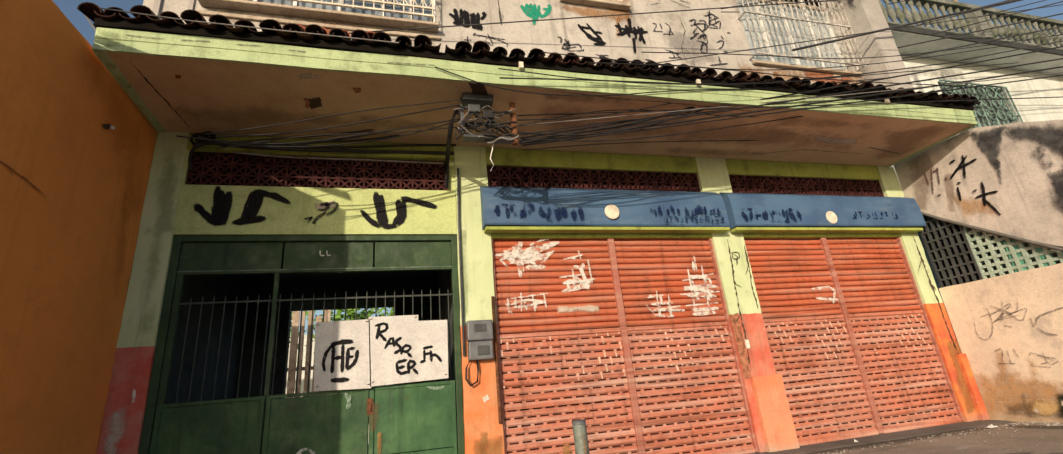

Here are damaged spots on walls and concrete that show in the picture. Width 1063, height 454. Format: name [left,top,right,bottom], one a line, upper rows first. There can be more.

crack [130,62,190,128]
crack [0,161,46,197]
damp [971,127,1063,209]
damp [981,360,1063,416]